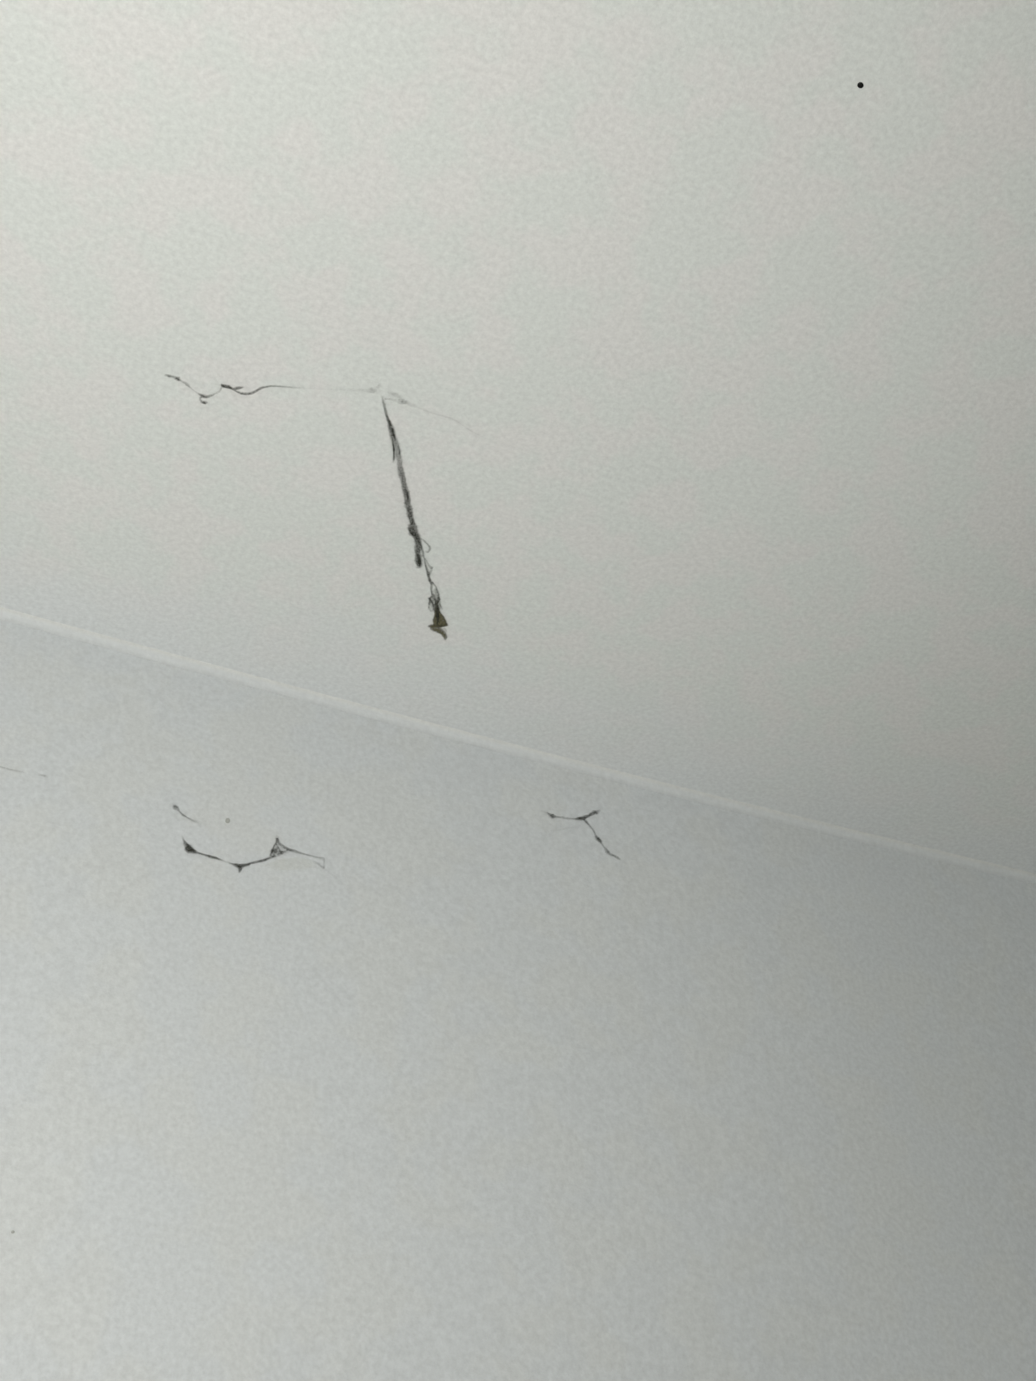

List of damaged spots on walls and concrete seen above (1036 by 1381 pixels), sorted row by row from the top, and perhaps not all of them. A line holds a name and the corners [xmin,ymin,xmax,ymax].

crack [168,376,264,404]
crack [384,408,447,639]
crack [550,811,609,852]
crack [184,842,292,871]